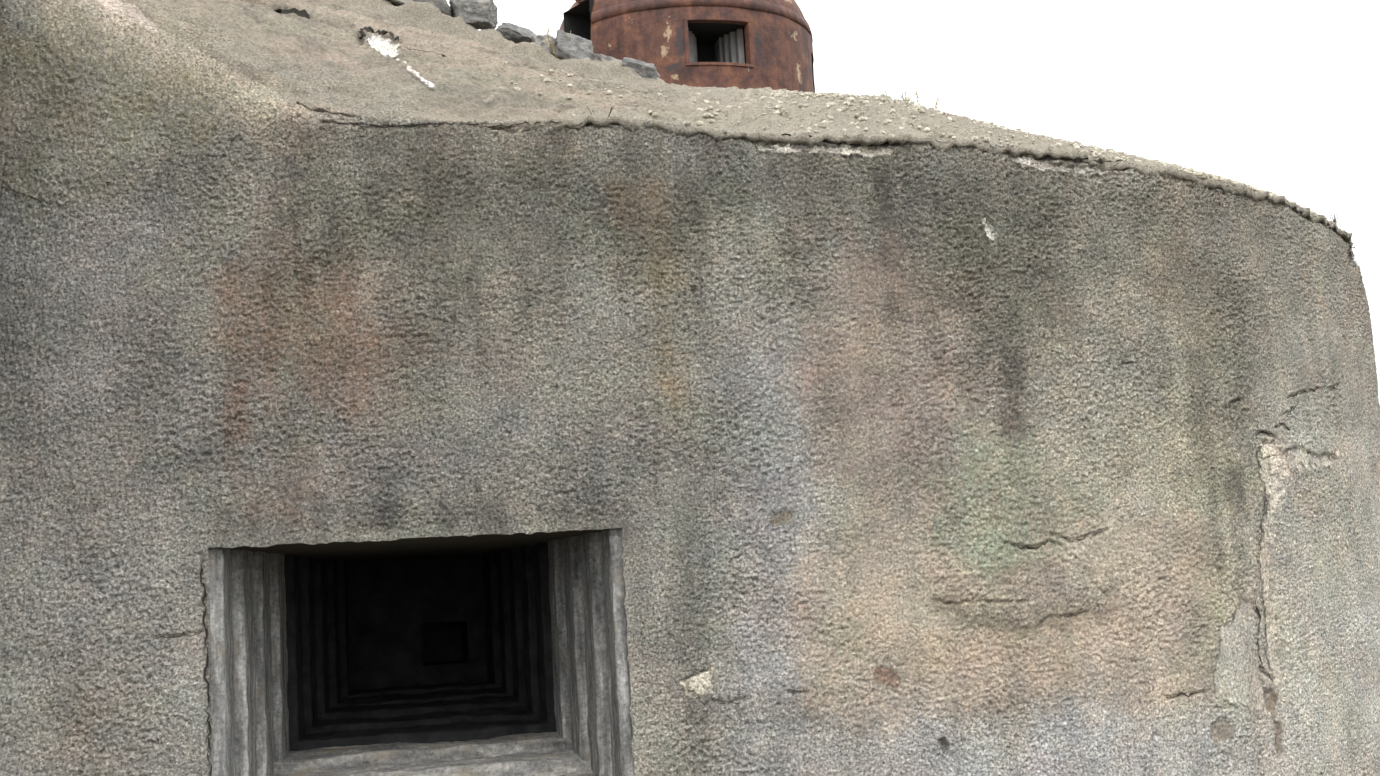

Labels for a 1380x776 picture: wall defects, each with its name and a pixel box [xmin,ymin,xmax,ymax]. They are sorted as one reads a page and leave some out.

spalling [365,33,434,88]
crack [323,121,636,133]
crack [766,132,889,147]
crack [1027,154,1165,172]
crack [1289,205,1355,248]
crack [1255,379,1343,549]
crack [1008,530,1105,574]
flaking render [1253,437,1340,755]
crack [1253,595,1273,681]